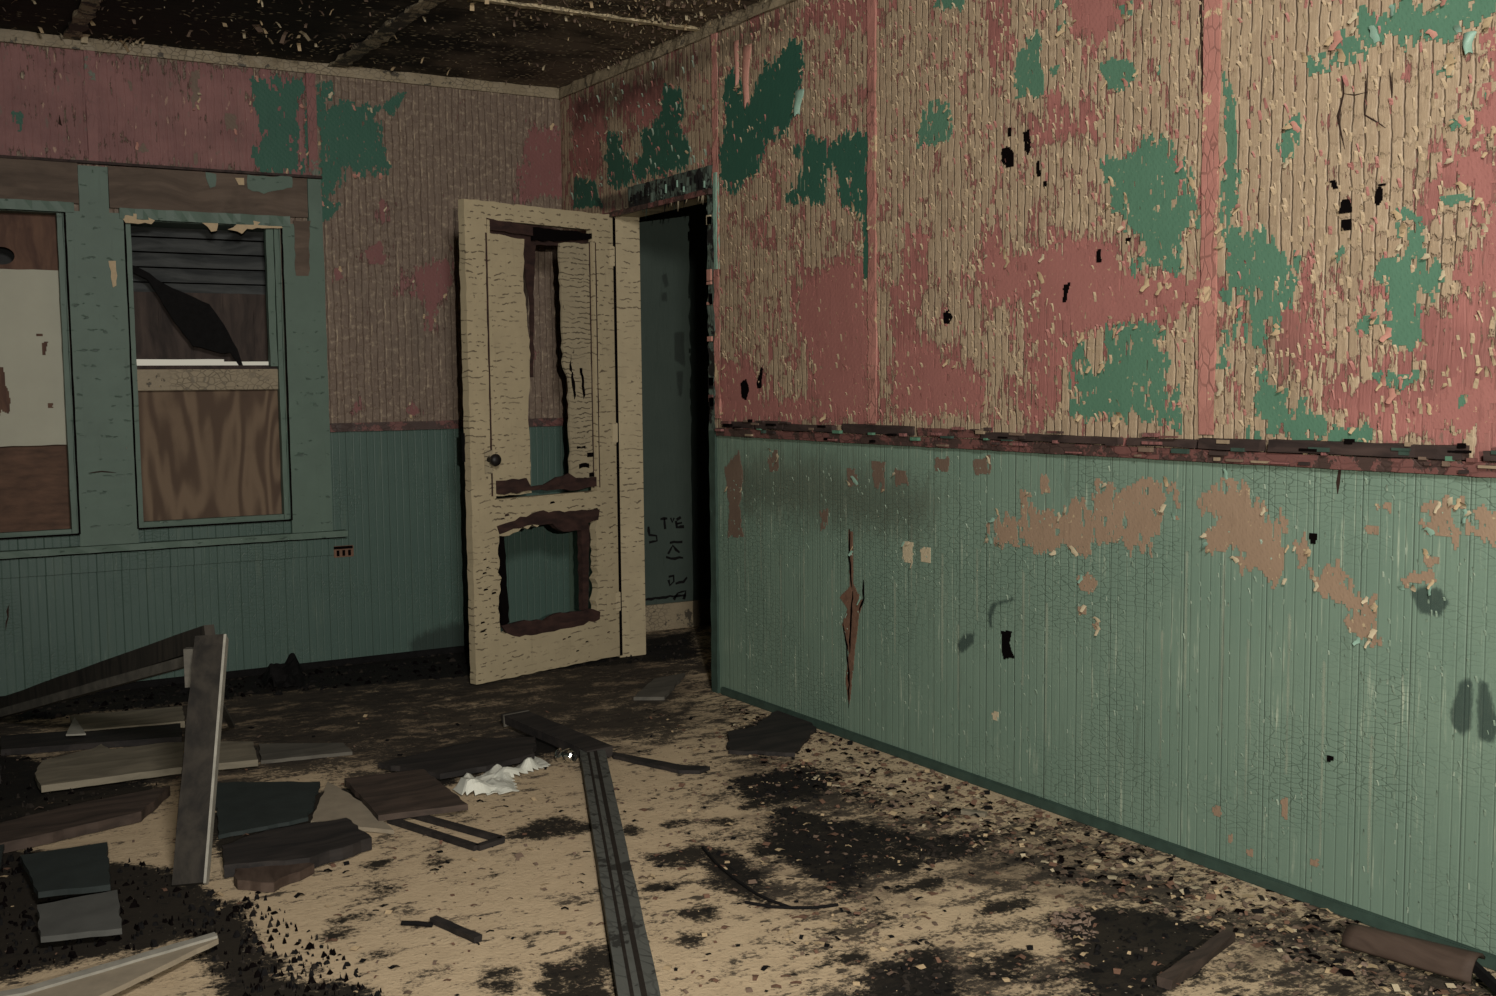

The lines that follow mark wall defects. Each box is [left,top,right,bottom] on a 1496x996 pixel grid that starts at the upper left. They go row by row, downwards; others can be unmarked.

peeling [170,0,407,222]
peeling [421,0,766,86]
peeling [573,82,690,210]
peeling [915,99,954,153]
peeling [1009,0,1066,100]
peeling [1100,49,1160,95]
peeling [1300,0,1496,352]
peeling [715,35,871,538]
peeling [0,367,11,414]
peeling [980,71,1382,648]
peeling [1372,367,1496,474]
peeling [1398,495,1496,596]